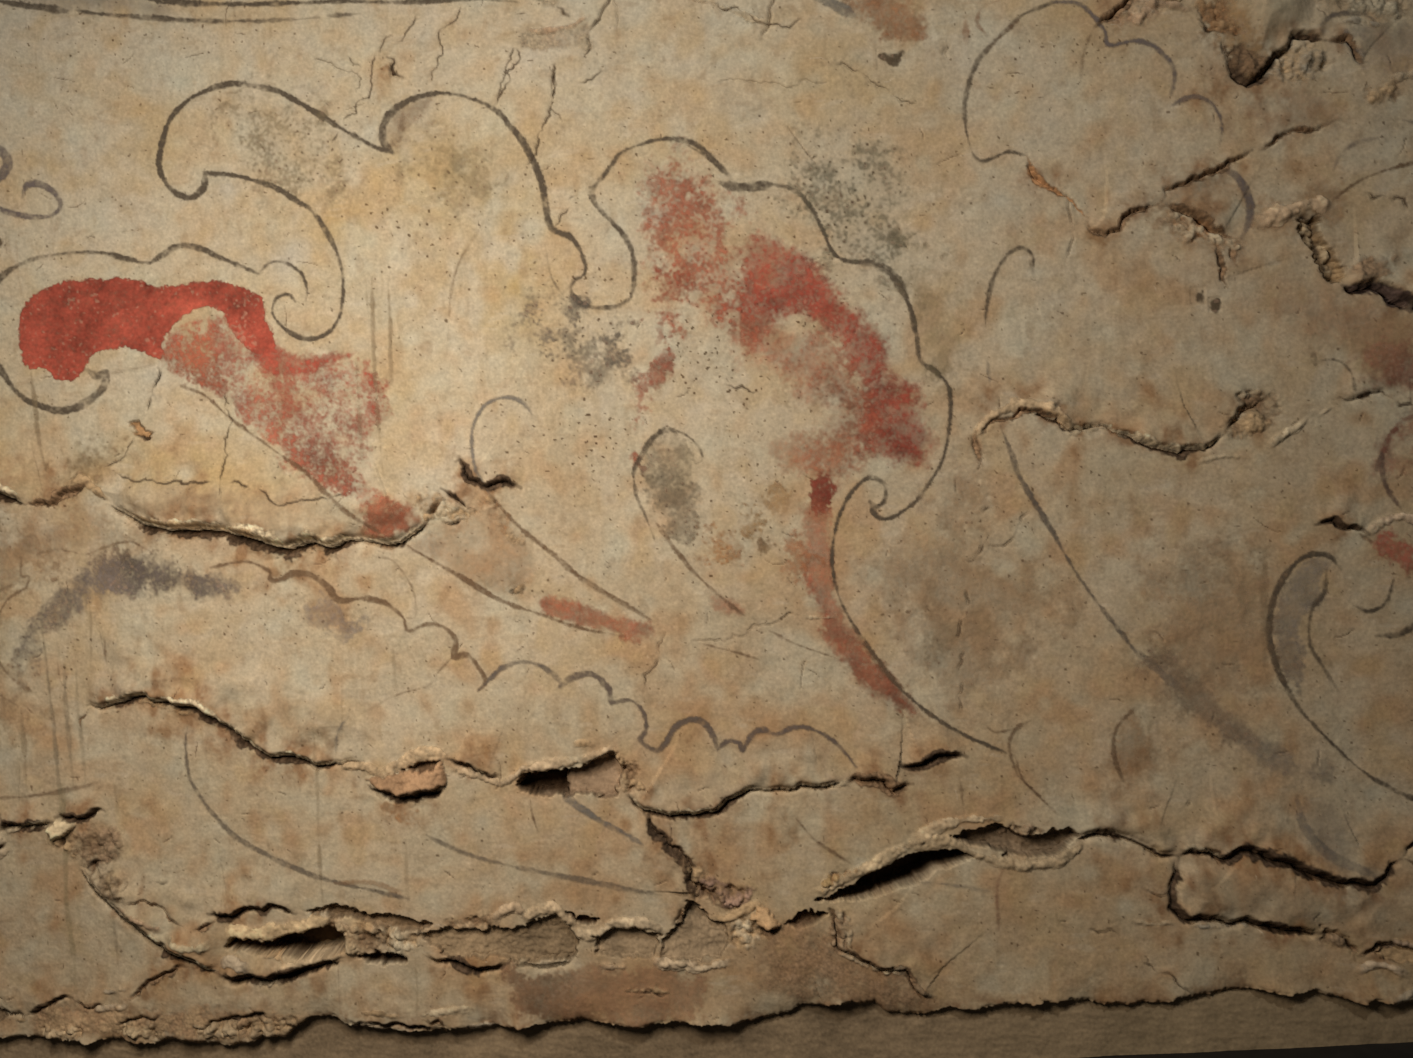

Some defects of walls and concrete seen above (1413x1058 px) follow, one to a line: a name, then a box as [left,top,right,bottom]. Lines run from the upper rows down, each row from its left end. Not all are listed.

crack [1204,26,1324,87]
crack [1027,156,1243,282]
crack [1344,280,1413,311]
crack [0,398,440,562]
crack [79,691,353,768]
flaking render [212,878,930,1008]
flaking render [820,815,1081,894]
crack [1086,829,1413,953]